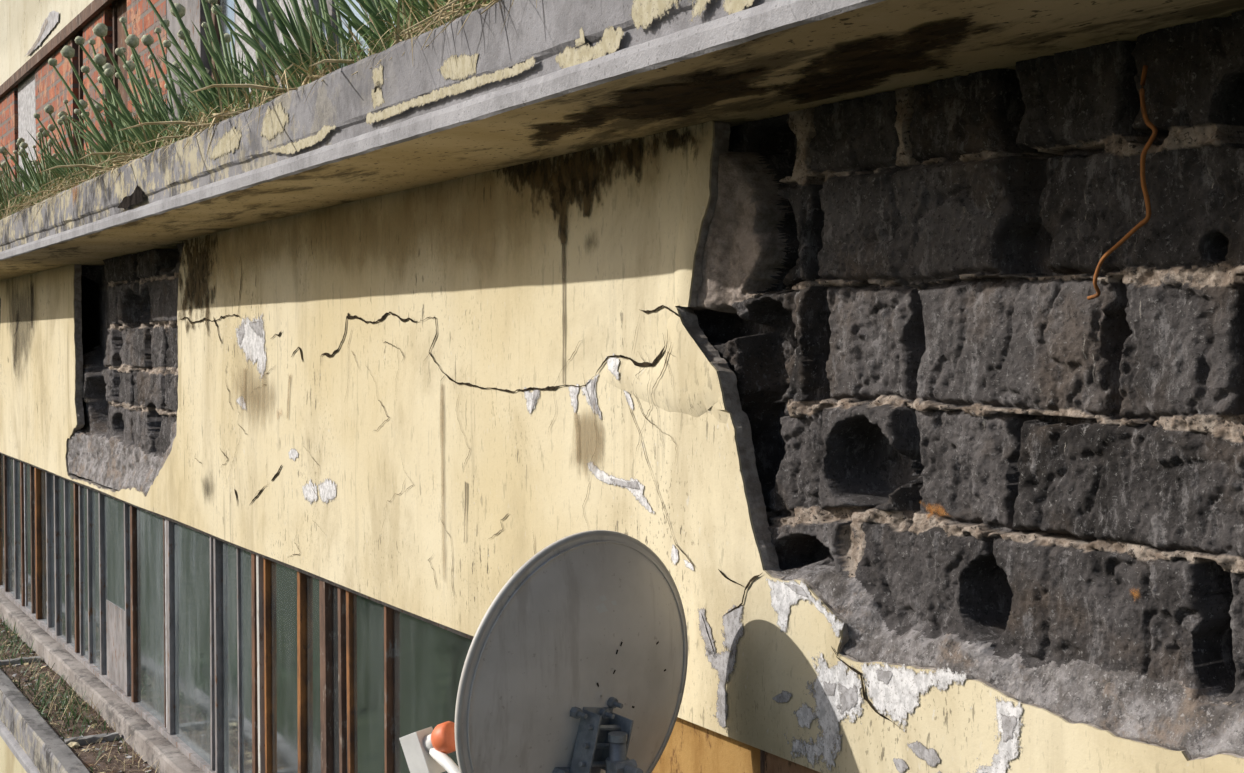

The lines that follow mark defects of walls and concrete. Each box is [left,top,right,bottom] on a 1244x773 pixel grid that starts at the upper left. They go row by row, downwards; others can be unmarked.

peeling [210,126,242,161]
peeling [260,102,336,155]
peeling [366,53,535,124]
peeling [555,0,754,69]
water stain [493,15,999,383]
corrosion [1087,65,1158,300]
spalling [67,243,185,495]
peeling [235,313,267,380]
crack [195,305,762,655]
spalling [690,11,1244,773]